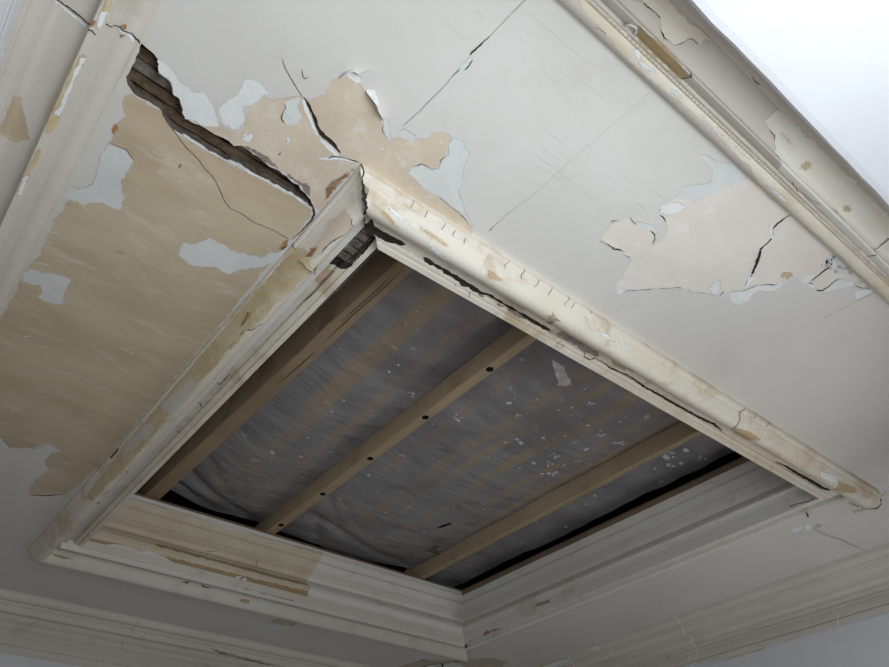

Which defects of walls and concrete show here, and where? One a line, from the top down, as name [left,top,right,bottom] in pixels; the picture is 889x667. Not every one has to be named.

crack [54,0,140,44]
crack [411,0,525,119]
crack [171,127,295,249]
crack [282,59,369,222]
peeling [580,0,889,305]
peeling [0,55,475,501]
crack [744,215,790,290]
peeling [399,658,509,667]